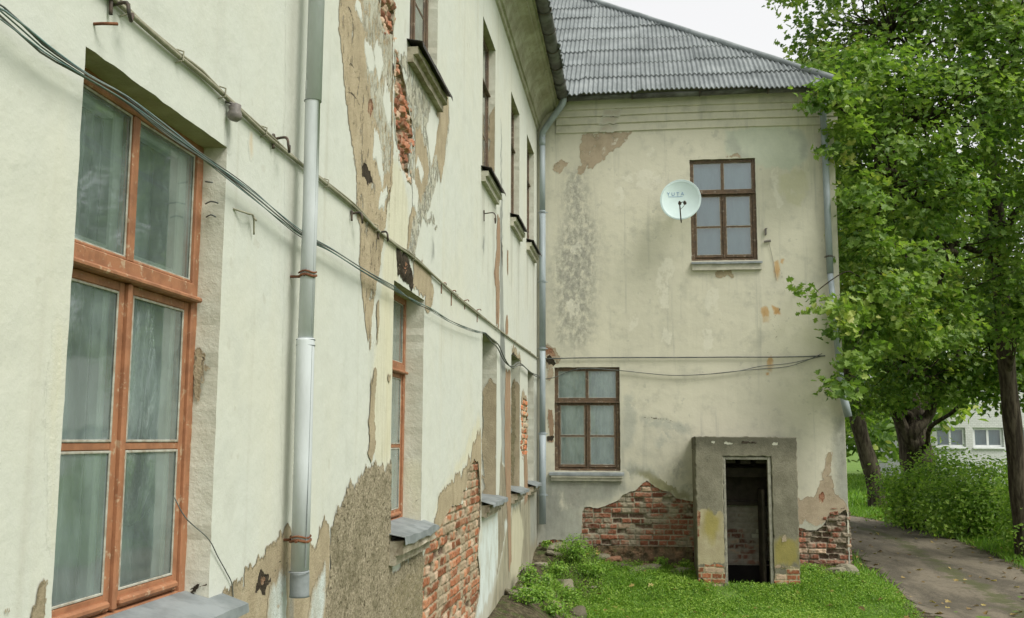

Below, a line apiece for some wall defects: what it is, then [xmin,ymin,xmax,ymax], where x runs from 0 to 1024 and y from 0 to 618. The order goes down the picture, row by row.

flaking render [338,0,450,349]
flaking render [553,131,632,175]
spalling [193,347,210,402]
flaking render [422,215,528,618]
damp [476,117,635,618]
flaking render [31,579,48,618]
flaking render [223,515,330,618]
flaking render [539,452,852,587]